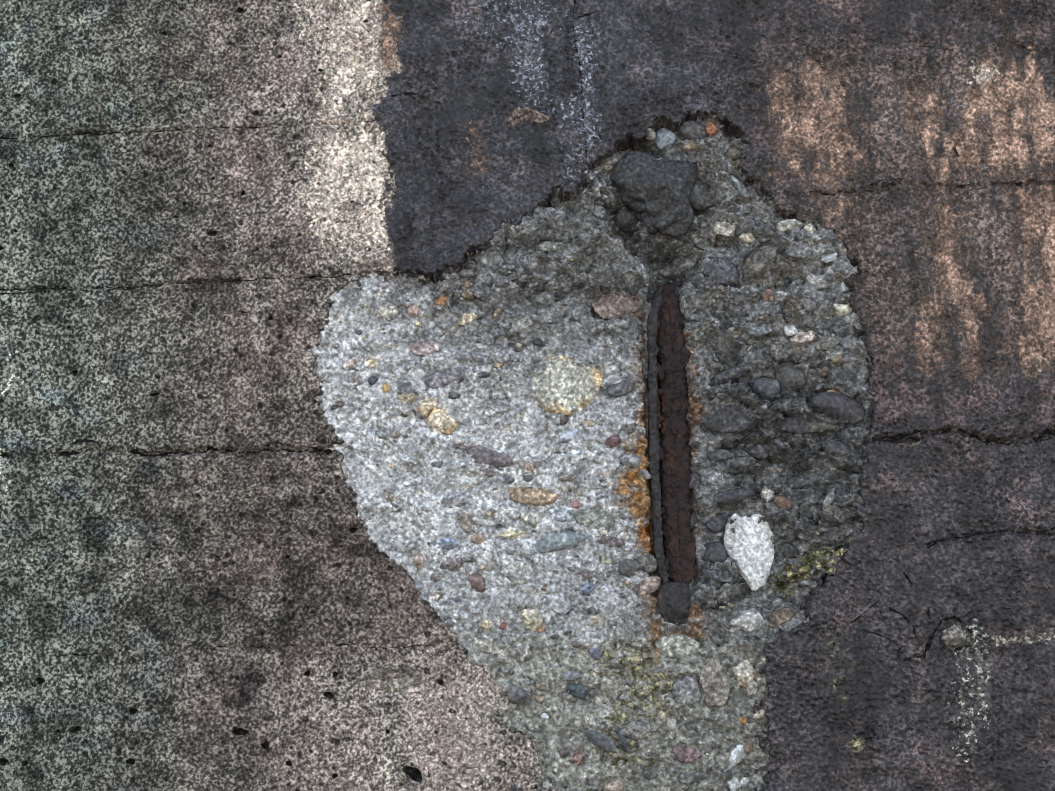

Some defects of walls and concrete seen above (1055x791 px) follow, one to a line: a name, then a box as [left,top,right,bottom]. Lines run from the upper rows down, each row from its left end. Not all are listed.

crack [59,438,100,456]
crack [131,441,336,457]
spalling [310,55,874,791]
corrosion [616,397,666,557]
corrosion [679,320,705,473]
crack [865,428,1054,445]
corrosion [638,587,707,665]